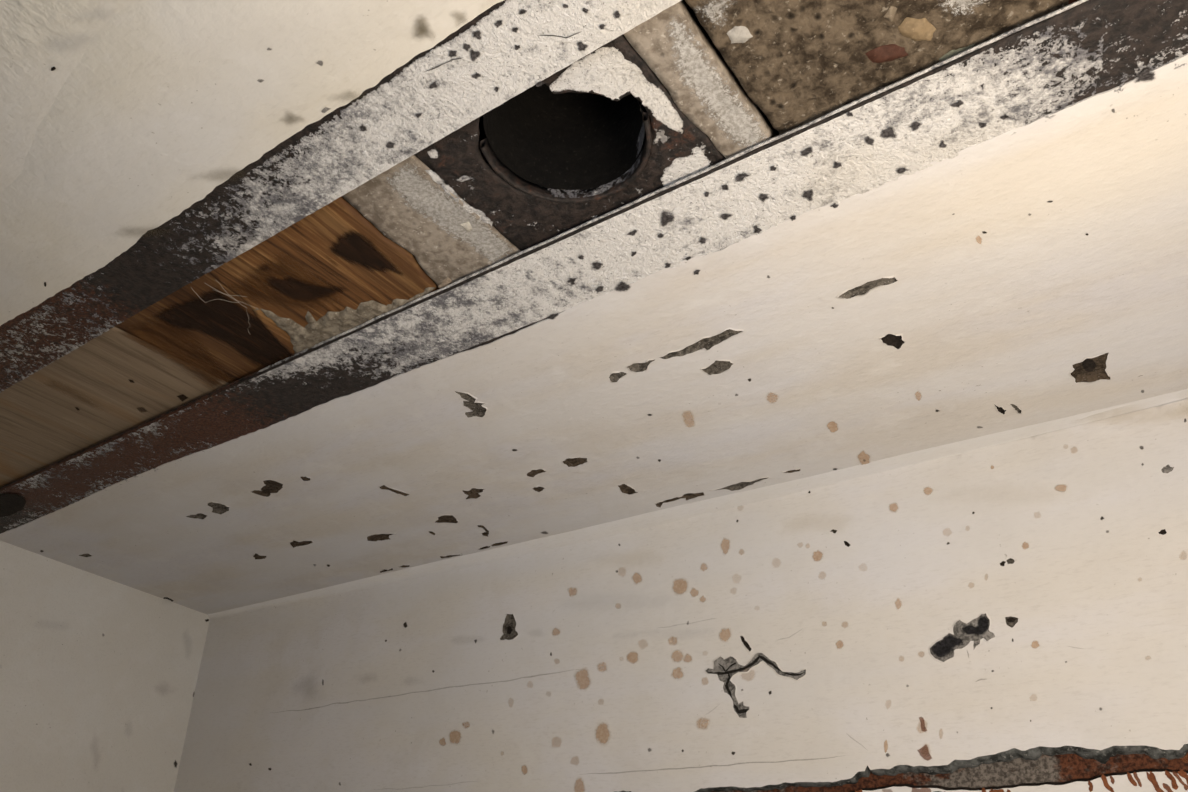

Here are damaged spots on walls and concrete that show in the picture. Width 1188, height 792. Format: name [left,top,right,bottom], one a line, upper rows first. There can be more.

peeling [0,0,1188,529]
spalling [367,533,396,542]
spalling [428,514,459,535]
damp [673,580,705,602]
flaking render [499,613,519,641]
flaking render [928,612,1018,664]
damp [672,651,691,678]
damp [576,670,589,688]
damp [440,731,460,746]
damp [596,724,609,743]
rust [918,717,932,761]
rust [1088,753,1188,792]